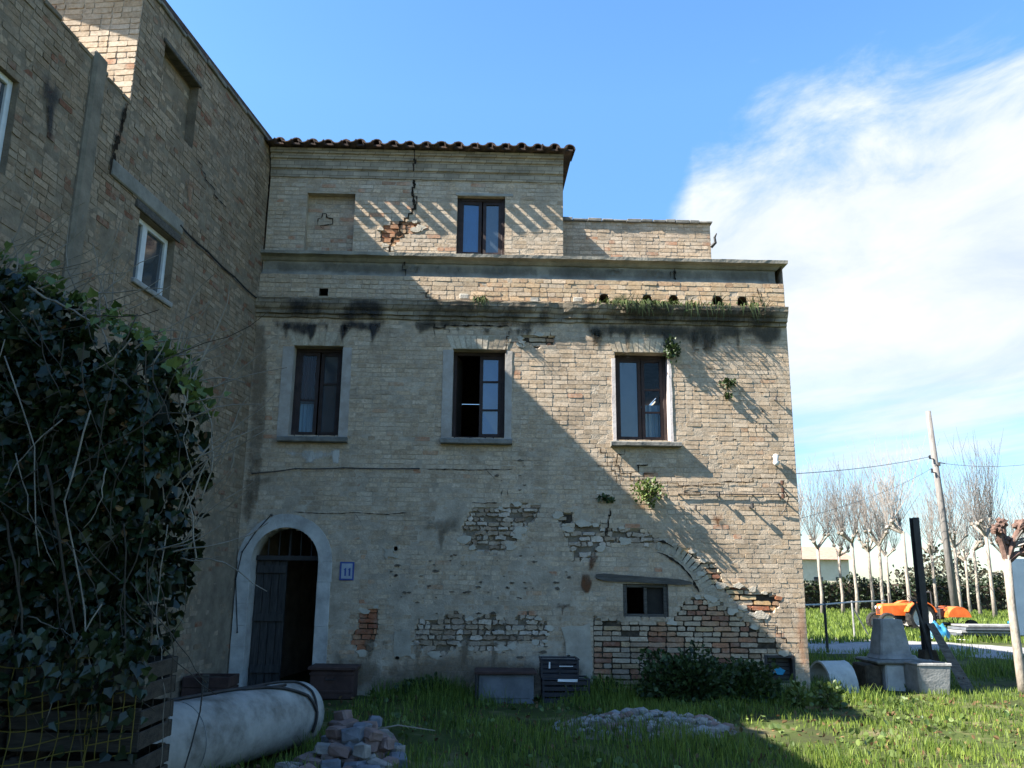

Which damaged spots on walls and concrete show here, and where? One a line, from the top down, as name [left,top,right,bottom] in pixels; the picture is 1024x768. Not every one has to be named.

leakage [45,82,58,138]
spalling [377,220,427,251]
crack [388,149,523,353]
leakage [277,299,327,340]
leakage [341,300,382,340]
spalling [449,475,540,576]
spalling [552,511,659,590]
spalling [351,605,379,657]
spalling [395,611,554,660]
spalling [593,547,789,691]